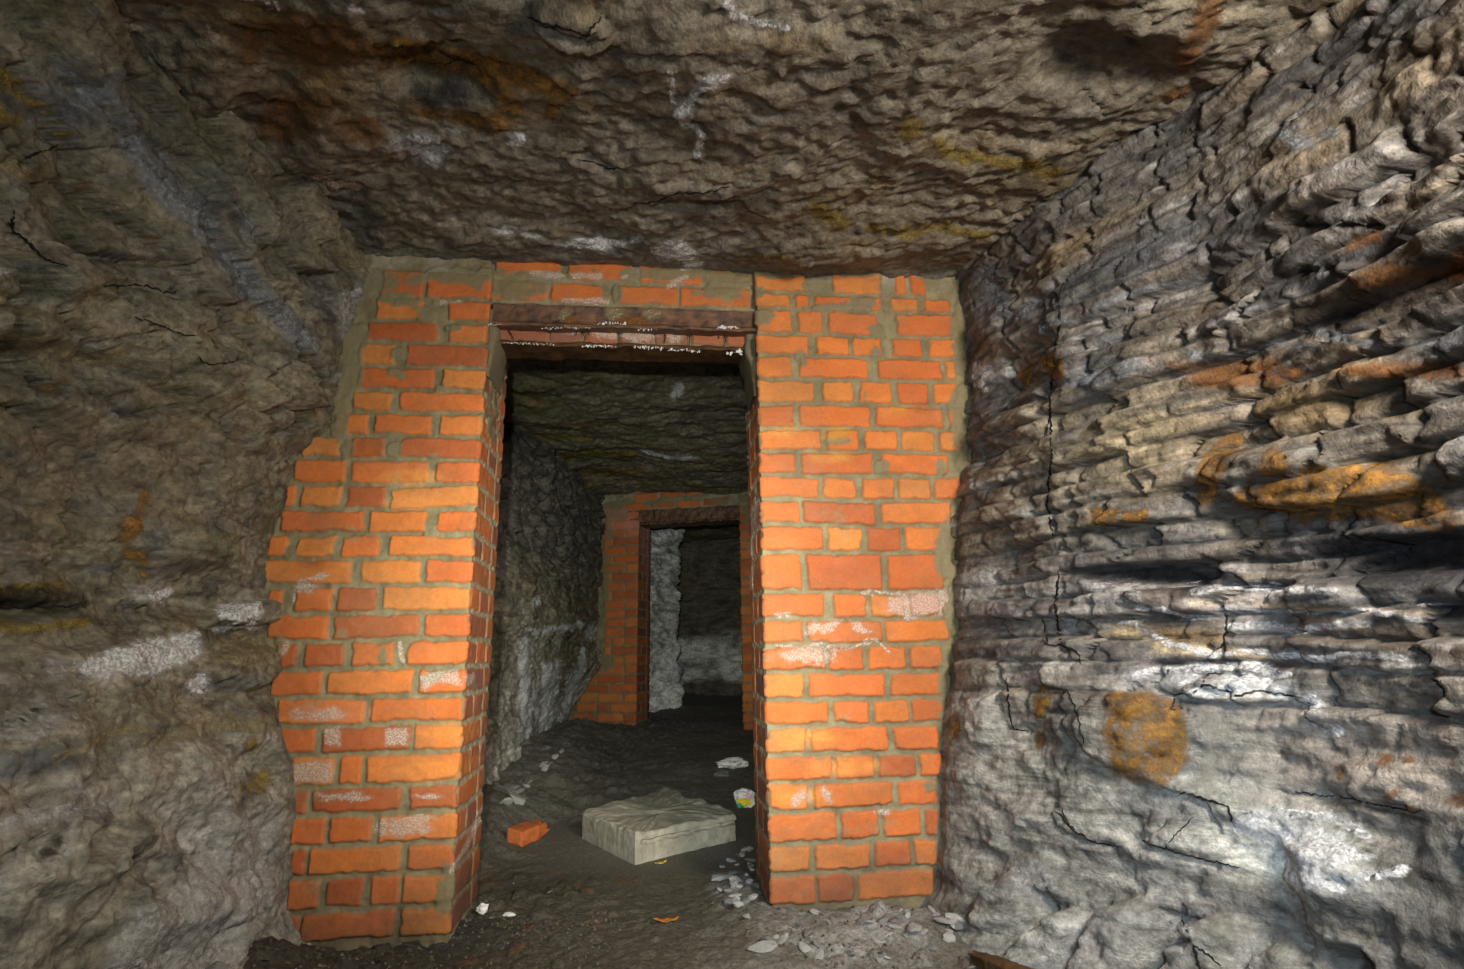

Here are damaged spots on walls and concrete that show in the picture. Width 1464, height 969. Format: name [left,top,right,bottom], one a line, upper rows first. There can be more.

crack [1042,283,1084,748]
damp [861,588,949,620]
damp [777,620,891,666]
crack [1160,604,1311,711]
crack [1005,677,1028,732]
damp [294,706,369,802]
damp [385,729,408,745]
damp [375,793,437,838]
crack [1054,791,1240,868]
crack [1295,791,1424,813]
crack [1182,916,1221,969]